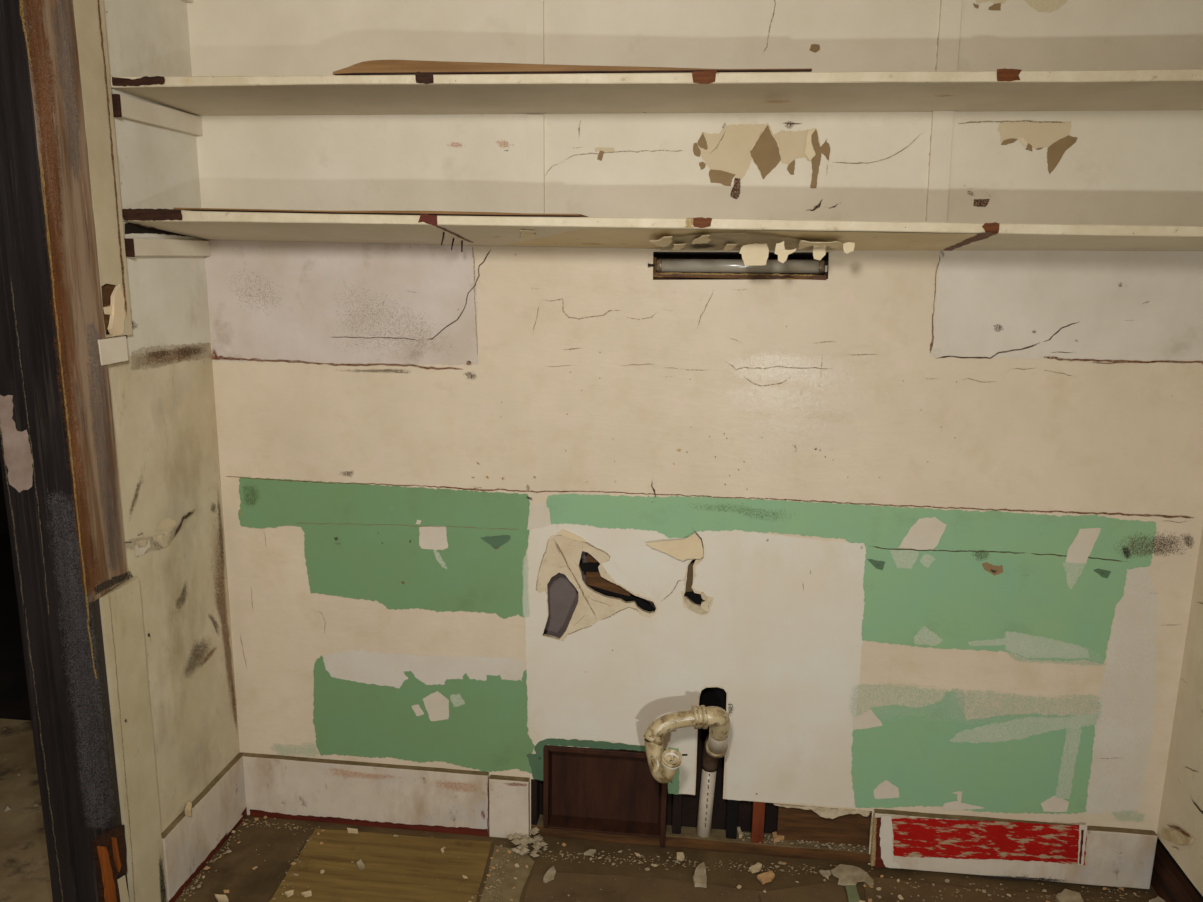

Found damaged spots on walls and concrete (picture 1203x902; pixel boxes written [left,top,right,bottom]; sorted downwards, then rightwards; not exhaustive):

peeling [973,0,1006,11]
peeling [693,121,830,199]
peeling [959,120,1078,174]
peeling [649,233,855,266]
crack [212,226,491,370]
crack [925,256,1203,382]
spalling [0,395,34,492]
spalling [536,527,714,642]
spalling [982,562,1003,576]
damp [1114,531,1195,561]
spalling [699,687,727,711]
spalling [531,726,871,864]